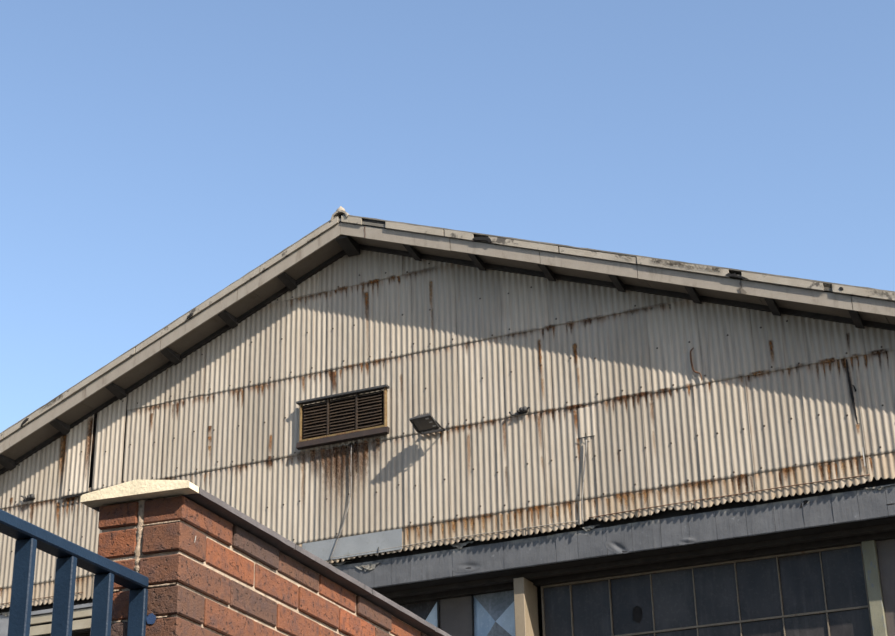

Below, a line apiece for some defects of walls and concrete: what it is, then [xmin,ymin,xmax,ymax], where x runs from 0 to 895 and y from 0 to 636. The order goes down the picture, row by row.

corrosion [782,349,888,374]
corrosion [606,388,672,414]
corrosion [535,404,582,431]
corrosion [59,434,67,471]
corrosion [819,456,873,480]
corrosion [607,490,648,508]
corrosion [407,501,578,540]